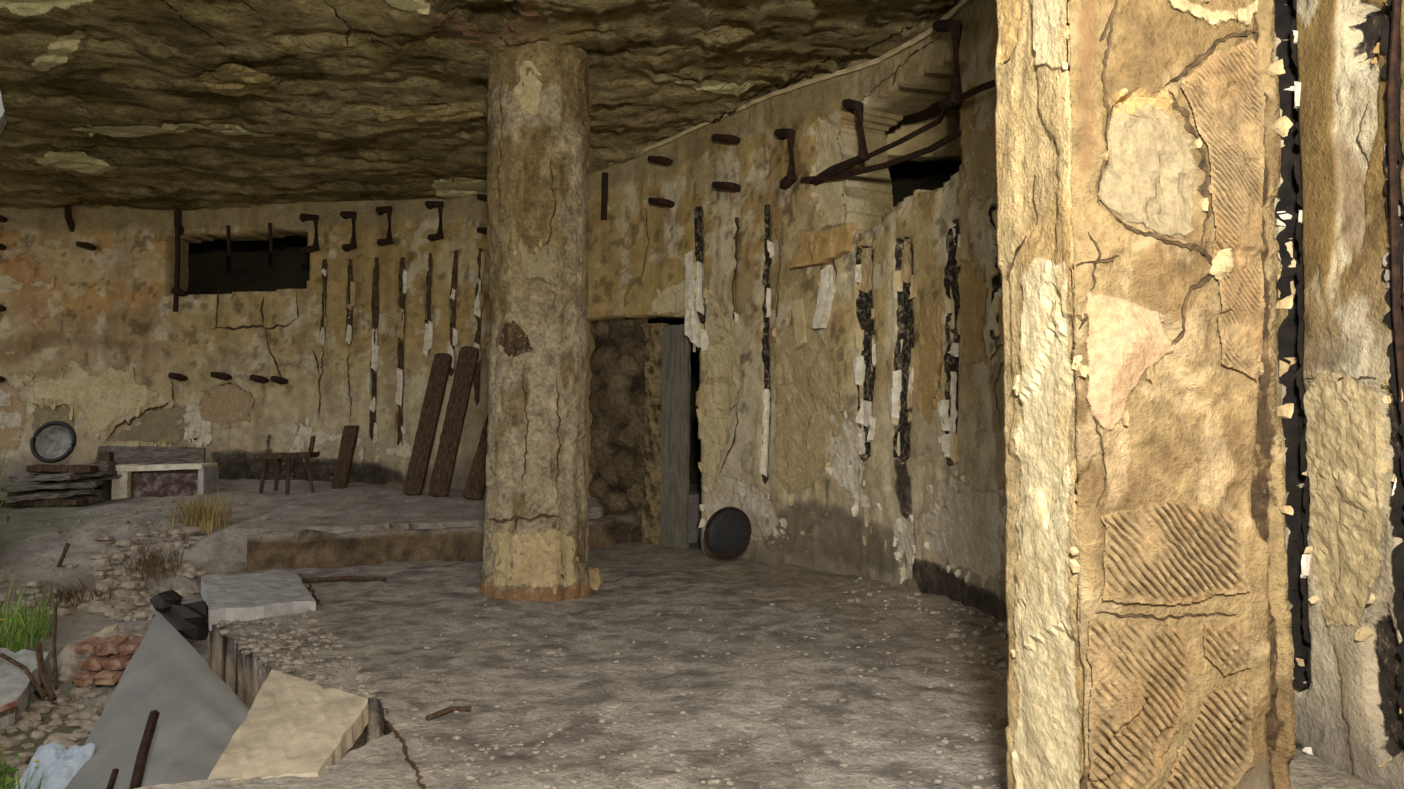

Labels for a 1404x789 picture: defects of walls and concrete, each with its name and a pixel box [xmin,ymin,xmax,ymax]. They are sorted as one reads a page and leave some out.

peeling [1000,0,1068,69]
peeling [1169,0,1259,43]
spalling [1350,0,1392,64]
spalling [1098,88,1209,236]
crack [1076,0,1256,345]
peeling [0,360,254,450]
peeling [1250,59,1404,789]
crack [376,710,426,789]